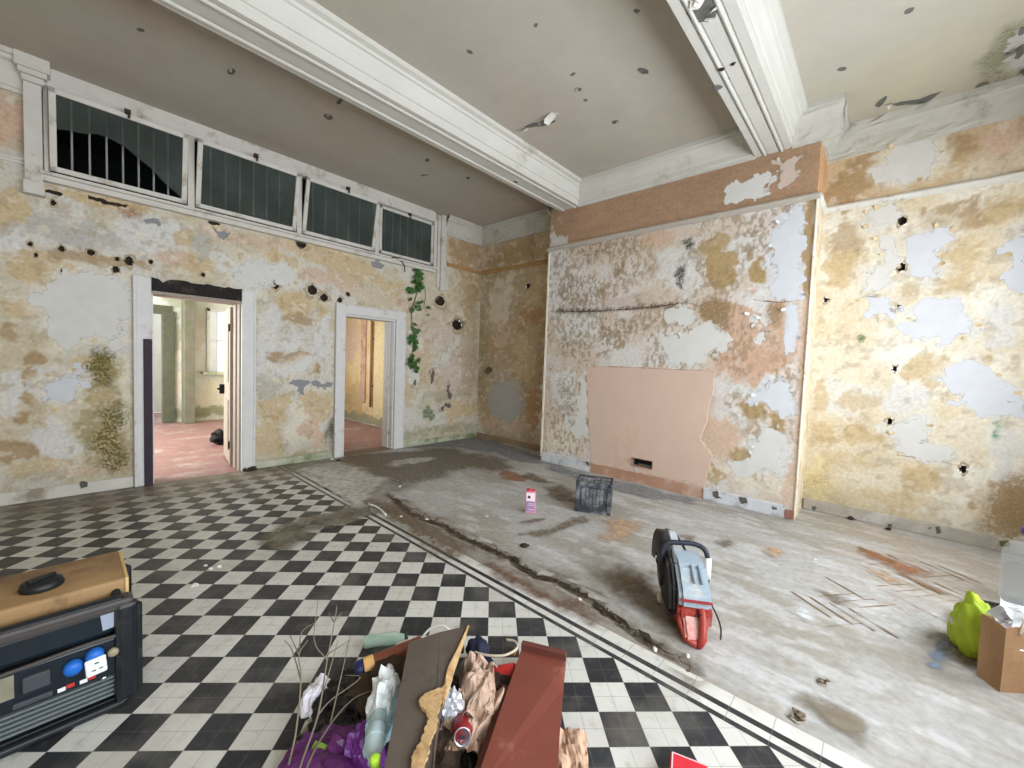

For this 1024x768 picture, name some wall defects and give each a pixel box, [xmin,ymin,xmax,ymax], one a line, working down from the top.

flaking render [1001,26,1024,76]
peeling [521,112,562,132]
peeling [875,91,942,110]
peeling [724,153,804,205]
peeling [867,139,944,185]
peeling [28,248,154,351]
peeling [744,202,808,355]
peeling [859,203,986,348]
damp [86,348,114,386]
peeling [934,359,1024,419]
damp [92,406,129,471]
crack [384,492,691,672]